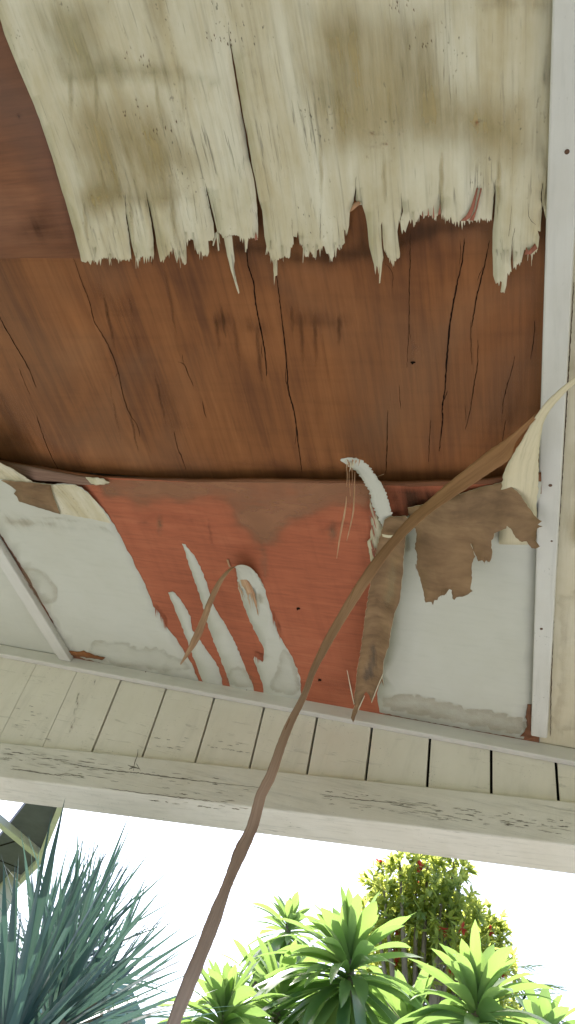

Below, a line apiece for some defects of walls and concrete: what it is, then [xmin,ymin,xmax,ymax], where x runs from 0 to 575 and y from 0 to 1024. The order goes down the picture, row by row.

crack [0,318,36,394]
crack [73,257,140,435]
peeling [0,20,545,714]
crack [247,256,302,471]
crack [428,183,543,461]